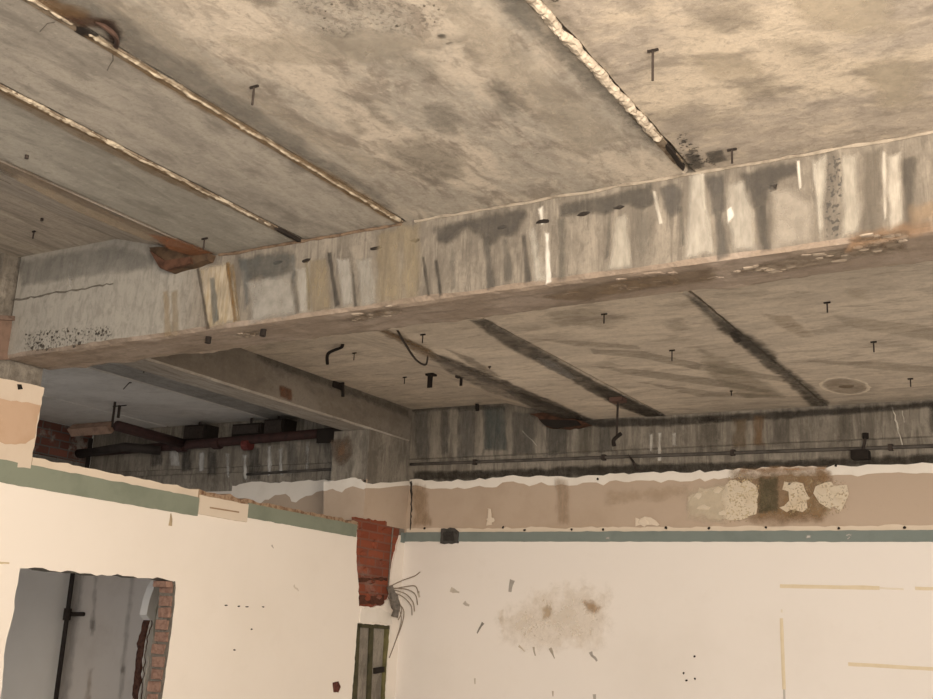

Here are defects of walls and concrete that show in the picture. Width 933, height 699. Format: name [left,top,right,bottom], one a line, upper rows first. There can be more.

corrosion [43,0,120,49]
corrosion [0,162,210,255]
water stain [438,211,551,289]
water stain [611,216,630,268]
water stain [562,134,810,259]
water stain [816,152,914,237]
corrosion [197,263,236,328]
water stain [380,297,933,522]
peeling [688,474,759,530]
peeling [780,481,849,513]
spalling [352,517,400,607]
spalling [132,581,175,699]